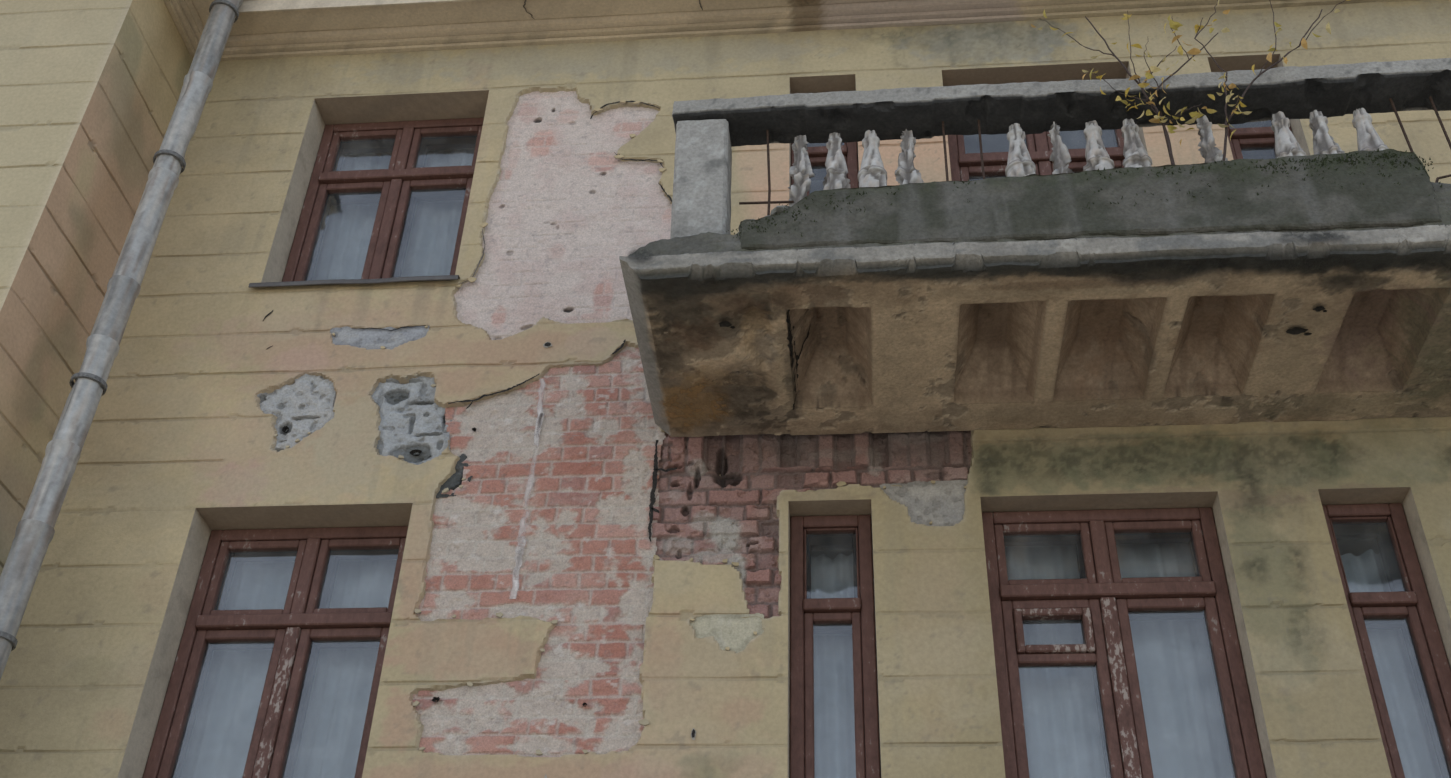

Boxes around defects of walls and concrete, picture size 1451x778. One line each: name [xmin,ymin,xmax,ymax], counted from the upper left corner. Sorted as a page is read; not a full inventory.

flaking render [454,91,672,340]
spalling [739,130,794,215]
peeling [330,325,429,350]
crack [786,309,811,410]
flaking render [257,374,336,452]
flaking render [371,344,972,757]